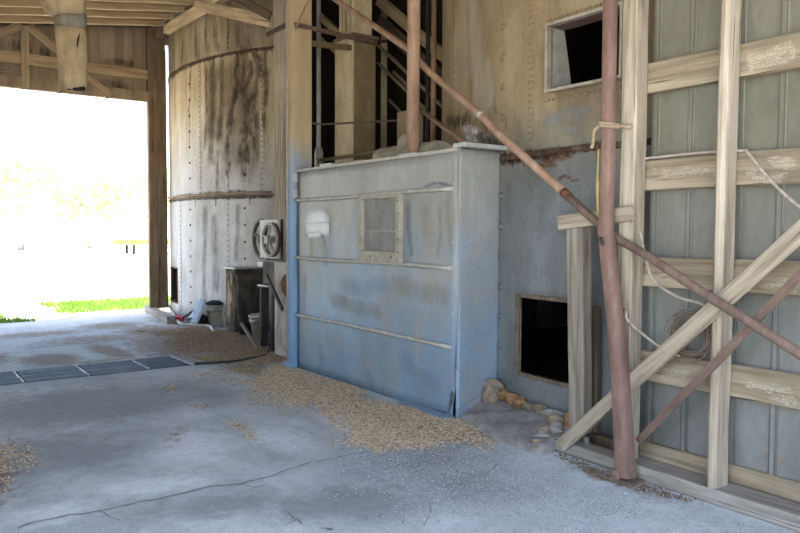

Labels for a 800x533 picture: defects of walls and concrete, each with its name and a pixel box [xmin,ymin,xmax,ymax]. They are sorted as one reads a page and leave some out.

damp [205,52,268,174]
corrosion [500,149,587,168]
crack [18,451,369,529]